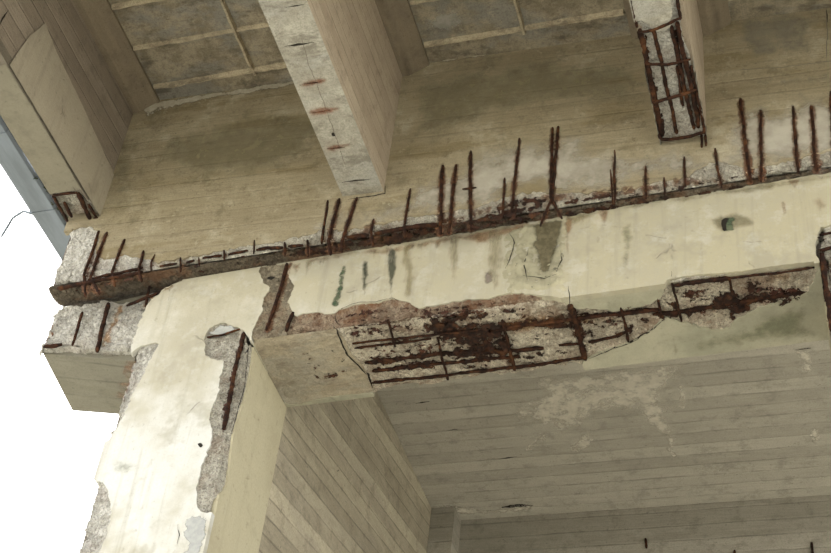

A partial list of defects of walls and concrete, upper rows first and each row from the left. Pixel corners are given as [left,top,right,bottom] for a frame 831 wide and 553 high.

water stain [388,250,396,284]
spalling [39,98,831,553]
rust [49,166,831,306]
water stain [533,216,584,272]